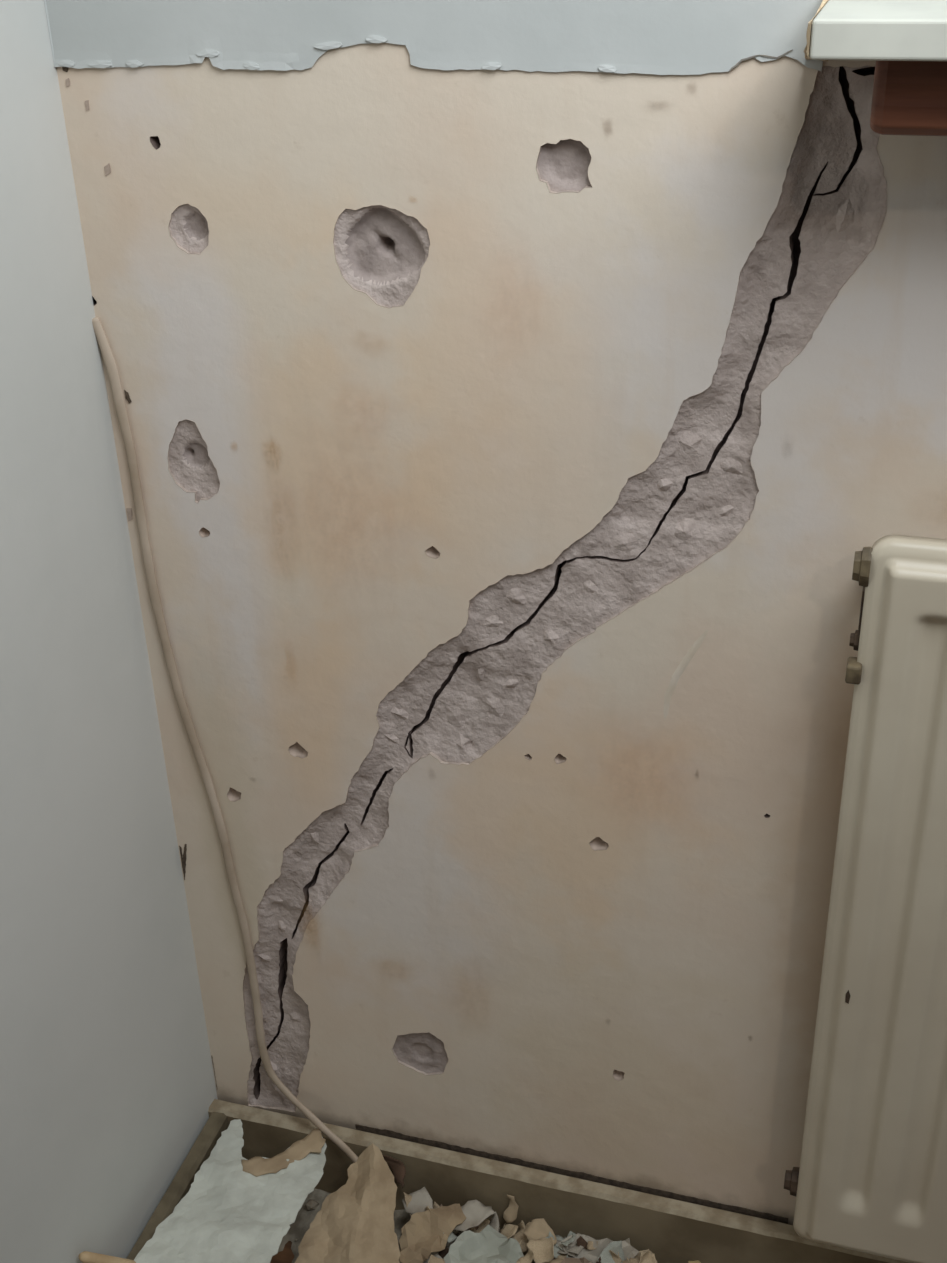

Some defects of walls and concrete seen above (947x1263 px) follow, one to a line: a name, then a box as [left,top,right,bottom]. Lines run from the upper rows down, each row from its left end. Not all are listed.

spalling [44,0,887,1112]
crack [253,66,875,1099]